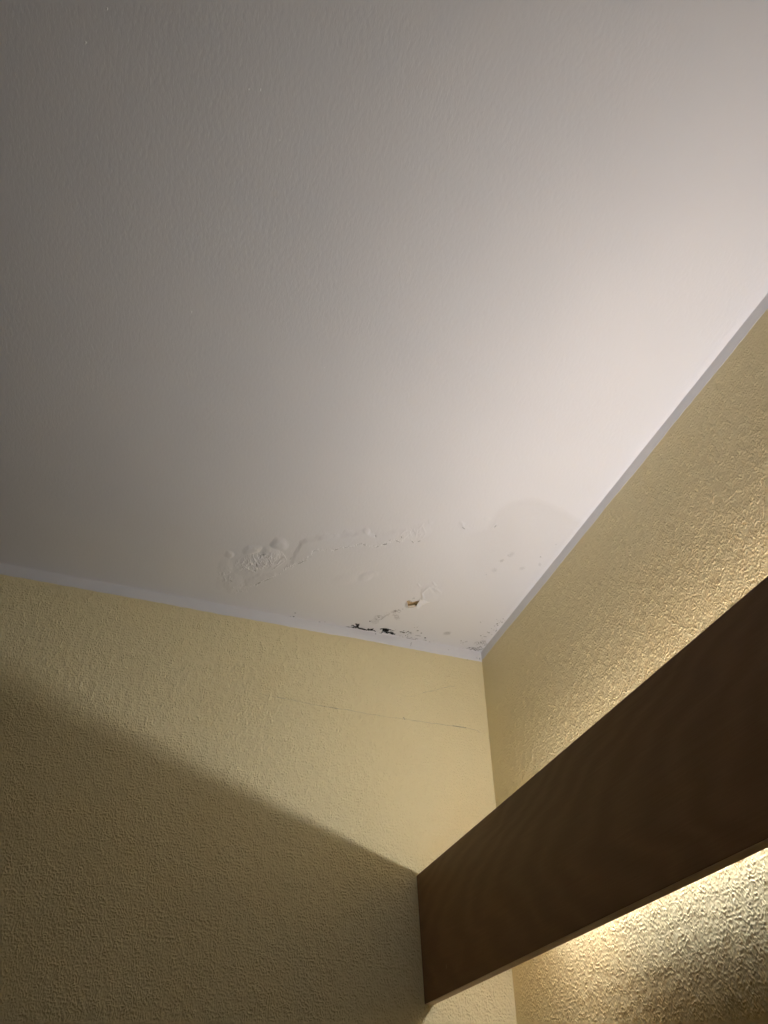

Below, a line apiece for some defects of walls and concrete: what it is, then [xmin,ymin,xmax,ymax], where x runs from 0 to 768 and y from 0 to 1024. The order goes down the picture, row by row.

mould [352,621,426,640]